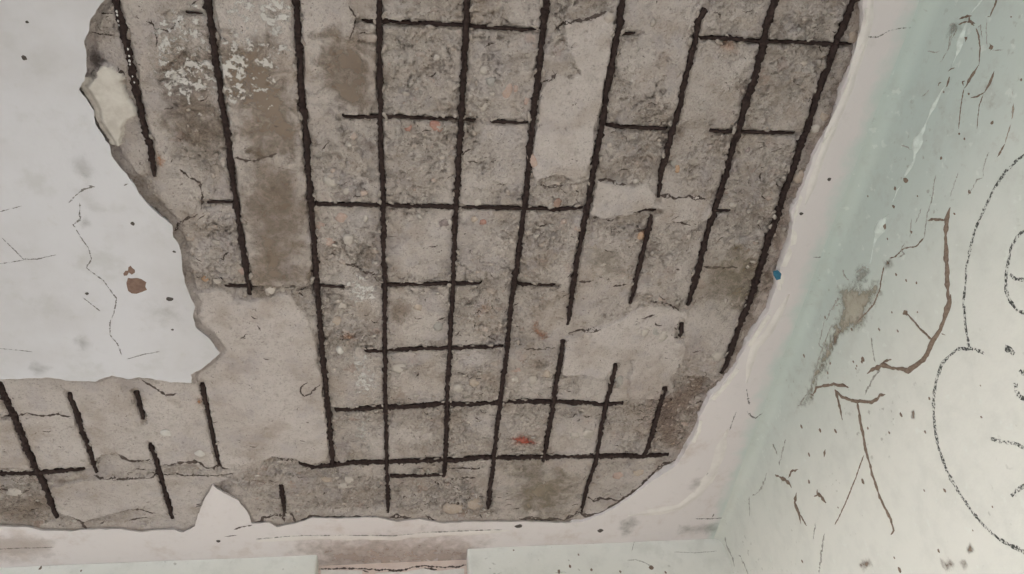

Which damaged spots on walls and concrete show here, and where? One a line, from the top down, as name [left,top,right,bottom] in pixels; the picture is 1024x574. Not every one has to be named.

crack [0,238,54,264]
spalling [0,0,869,531]